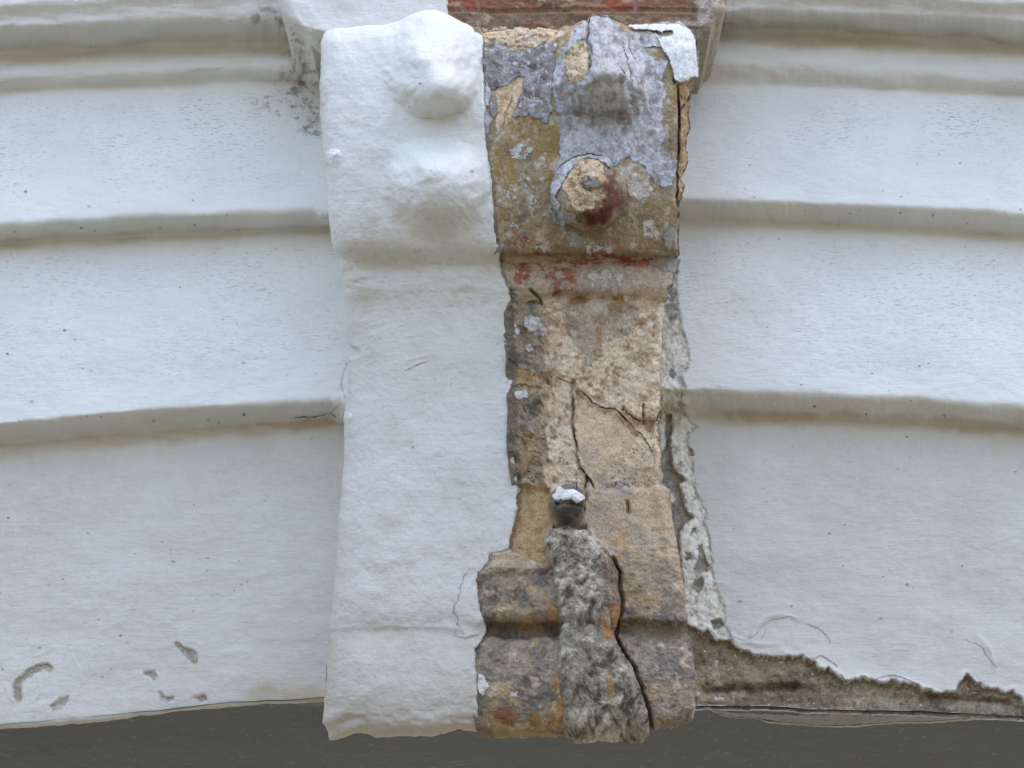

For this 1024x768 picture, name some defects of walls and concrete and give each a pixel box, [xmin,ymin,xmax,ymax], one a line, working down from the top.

rust [580,170,628,226]
crack [556,376,661,504]
flaking render [448,14,1024,744]
peeling [14,664,52,702]
peeling [176,643,197,663]
crack [608,555,652,727]